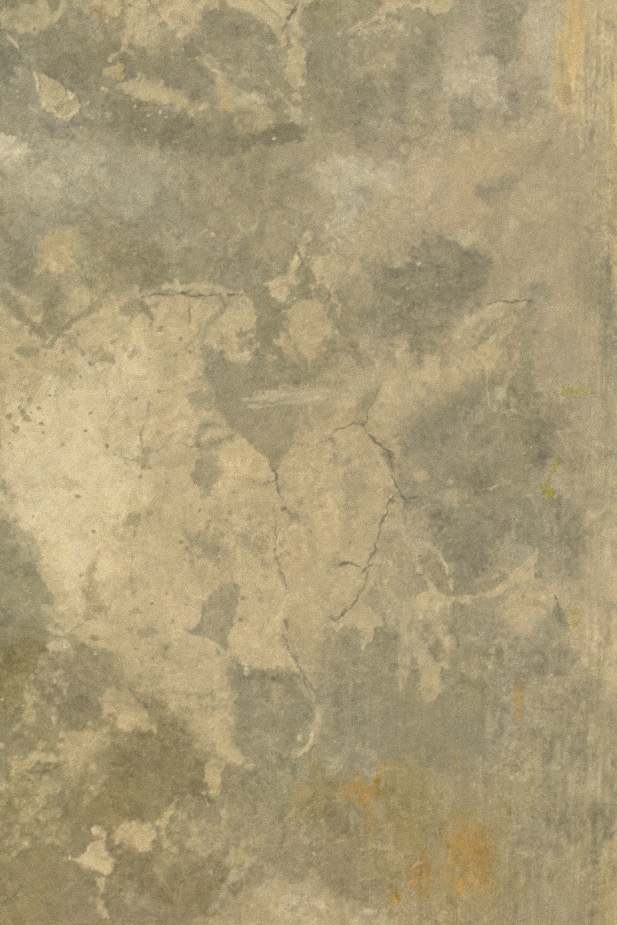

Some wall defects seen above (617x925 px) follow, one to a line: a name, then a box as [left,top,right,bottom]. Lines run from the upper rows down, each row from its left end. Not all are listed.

crack [250,0,305,45]
crack [139,289,247,325]
crack [248,468,291,591]
crack [288,385,428,623]
rust [340,746,512,924]